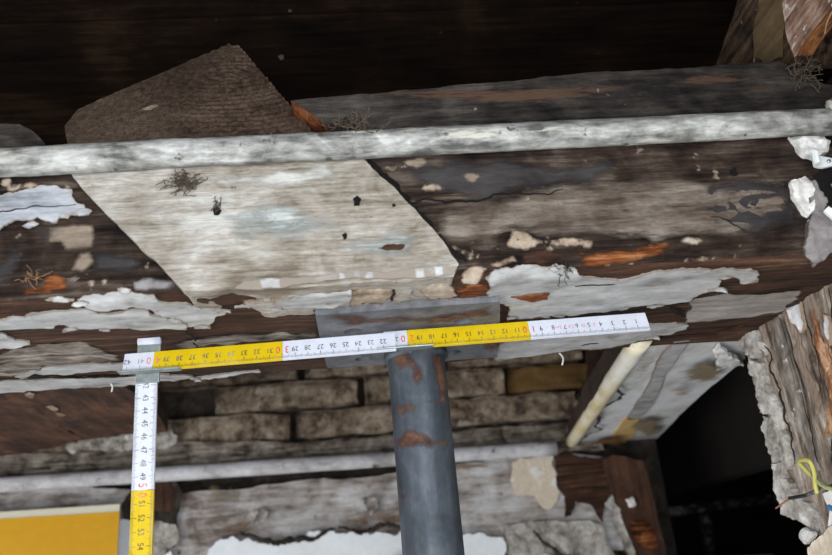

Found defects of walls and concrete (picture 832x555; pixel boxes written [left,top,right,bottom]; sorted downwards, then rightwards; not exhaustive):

peeling [0,185,92,230]
peeling [0,266,456,349]
corrosion [333,308,489,325]
peeling [485,263,822,415]
peeling [823,313,832,347]
peeling [0,362,136,393]
peeling [160,369,261,382]
corrosion [394,354,422,381]
corrosion [398,431,446,447]
flaking render [502,451,635,555]